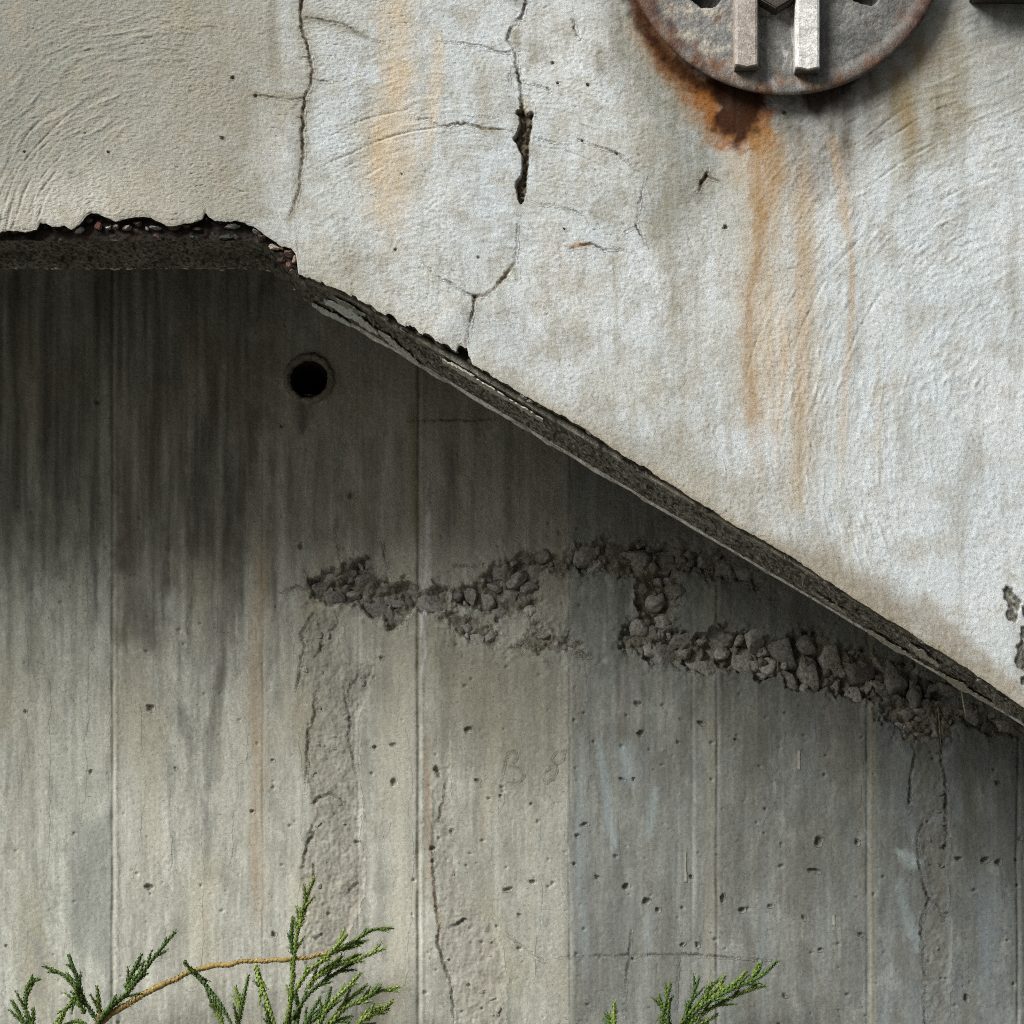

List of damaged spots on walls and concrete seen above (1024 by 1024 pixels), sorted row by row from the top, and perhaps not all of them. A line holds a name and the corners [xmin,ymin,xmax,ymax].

crack [253,0,386,224]
crack [418,223,519,347]
crack [411,0,648,254]
crack [696,165,722,196]
corrosion [618,0,865,527]
damp [420,427,464,589]
spalling [0,213,1024,709]
damp [497,424,527,534]
damp [0,269,342,1011]
crack [436,770,447,824]
crack [431,852,467,1024]
crack [905,711,949,1024]